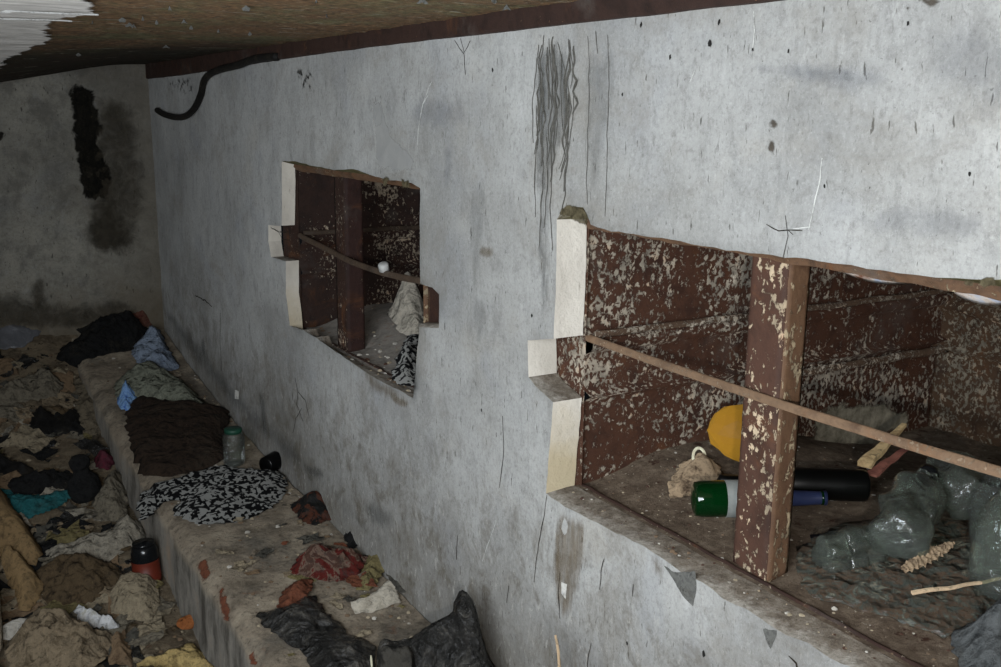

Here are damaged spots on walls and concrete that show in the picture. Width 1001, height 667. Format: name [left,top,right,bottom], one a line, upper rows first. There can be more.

peeling [69,84,111,200]